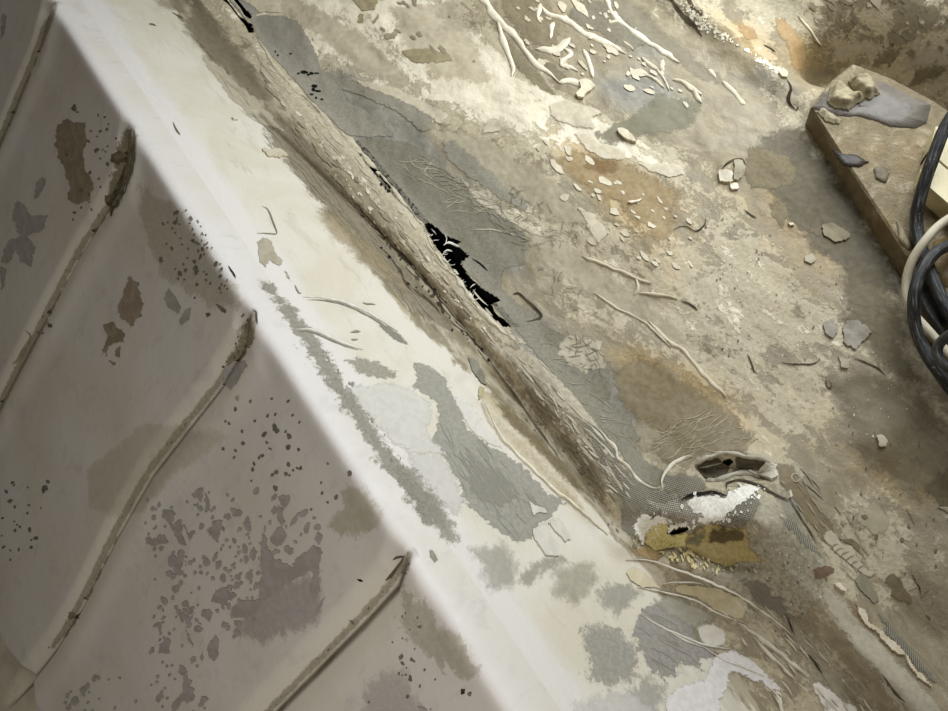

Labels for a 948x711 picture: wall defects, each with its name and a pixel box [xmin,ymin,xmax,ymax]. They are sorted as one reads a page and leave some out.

crack [670,0,703,36]
peeling [54,119,94,205]
damp [556,152,678,241]
peeling [0,201,48,290]
peeling [239,0,665,487]
damp [745,127,920,380]
damp [614,358,751,462]
peeling [157,521,190,580]
peeling [194,488,237,543]
peeling [185,505,325,661]
peeling [748,462,778,481]